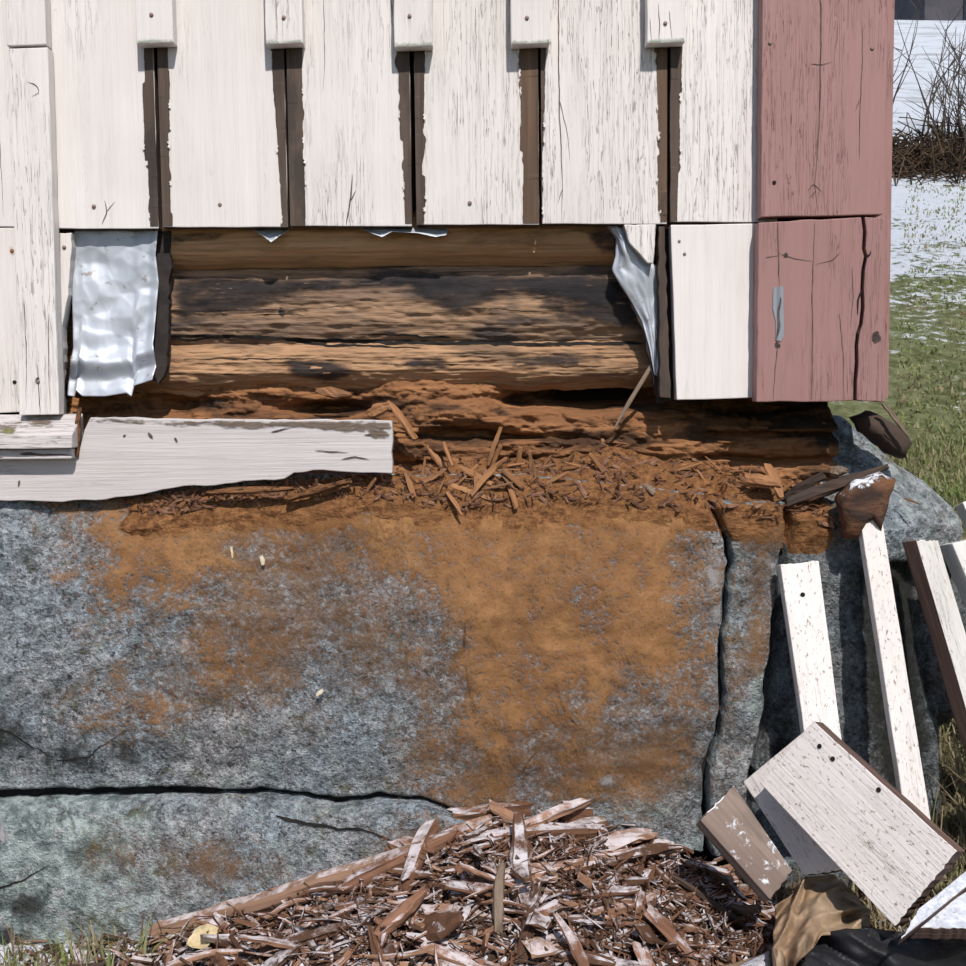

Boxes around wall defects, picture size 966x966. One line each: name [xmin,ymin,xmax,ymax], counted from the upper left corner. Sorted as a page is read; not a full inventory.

crack [767,0,871,399]
leakage [176,273,638,325]
leakage [288,360,353,380]
leakage [406,359,446,369]
leakage [515,354,582,366]
peeling [157,420,392,438]
rust [32,498,783,820]
crack [701,532,729,788]
crack [0,728,128,761]
crack [0,786,451,808]
crack [276,815,394,841]
crack [0,864,50,889]